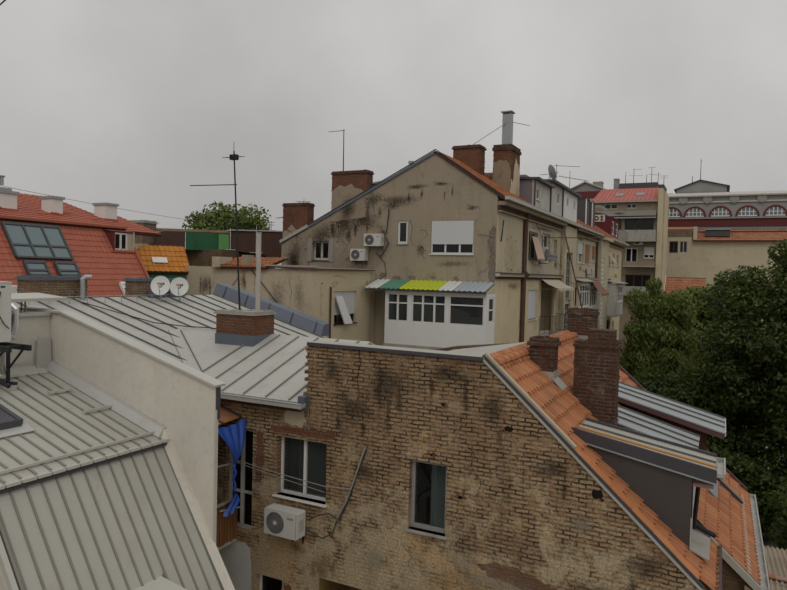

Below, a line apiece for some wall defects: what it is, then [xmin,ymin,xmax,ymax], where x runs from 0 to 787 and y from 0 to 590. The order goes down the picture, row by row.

spalling [470,560,557,590]